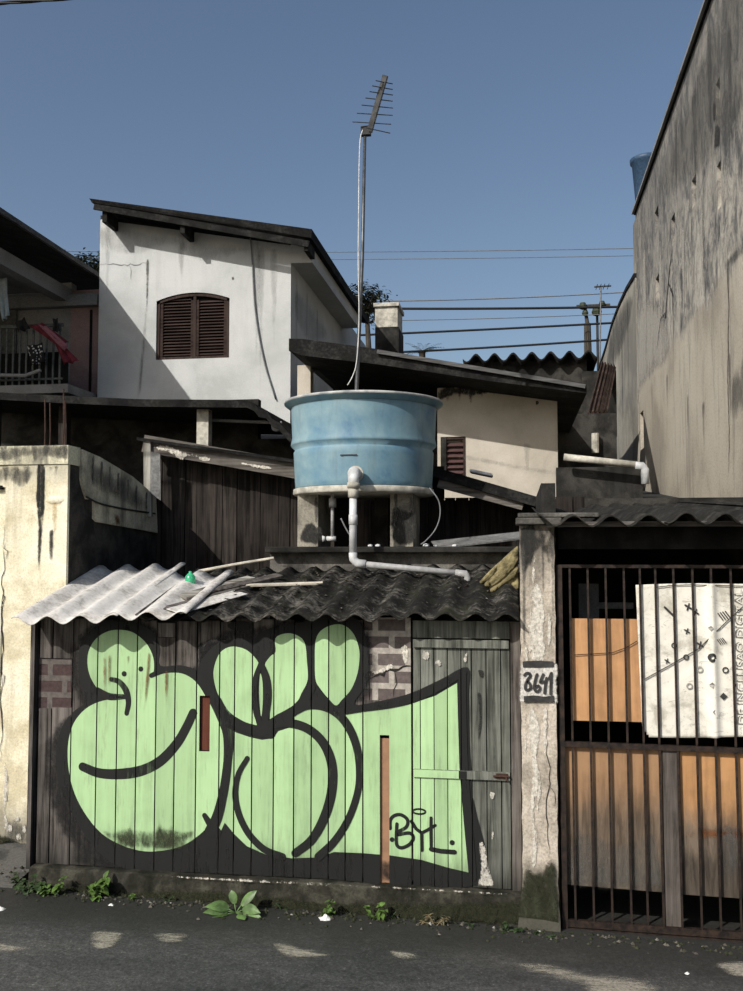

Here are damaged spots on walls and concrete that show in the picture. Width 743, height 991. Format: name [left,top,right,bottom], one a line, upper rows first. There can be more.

leakage [728,356,743,409]
leakage [0,445,67,563]
leakage [91,456,147,509]
peeling [479,833,494,893]